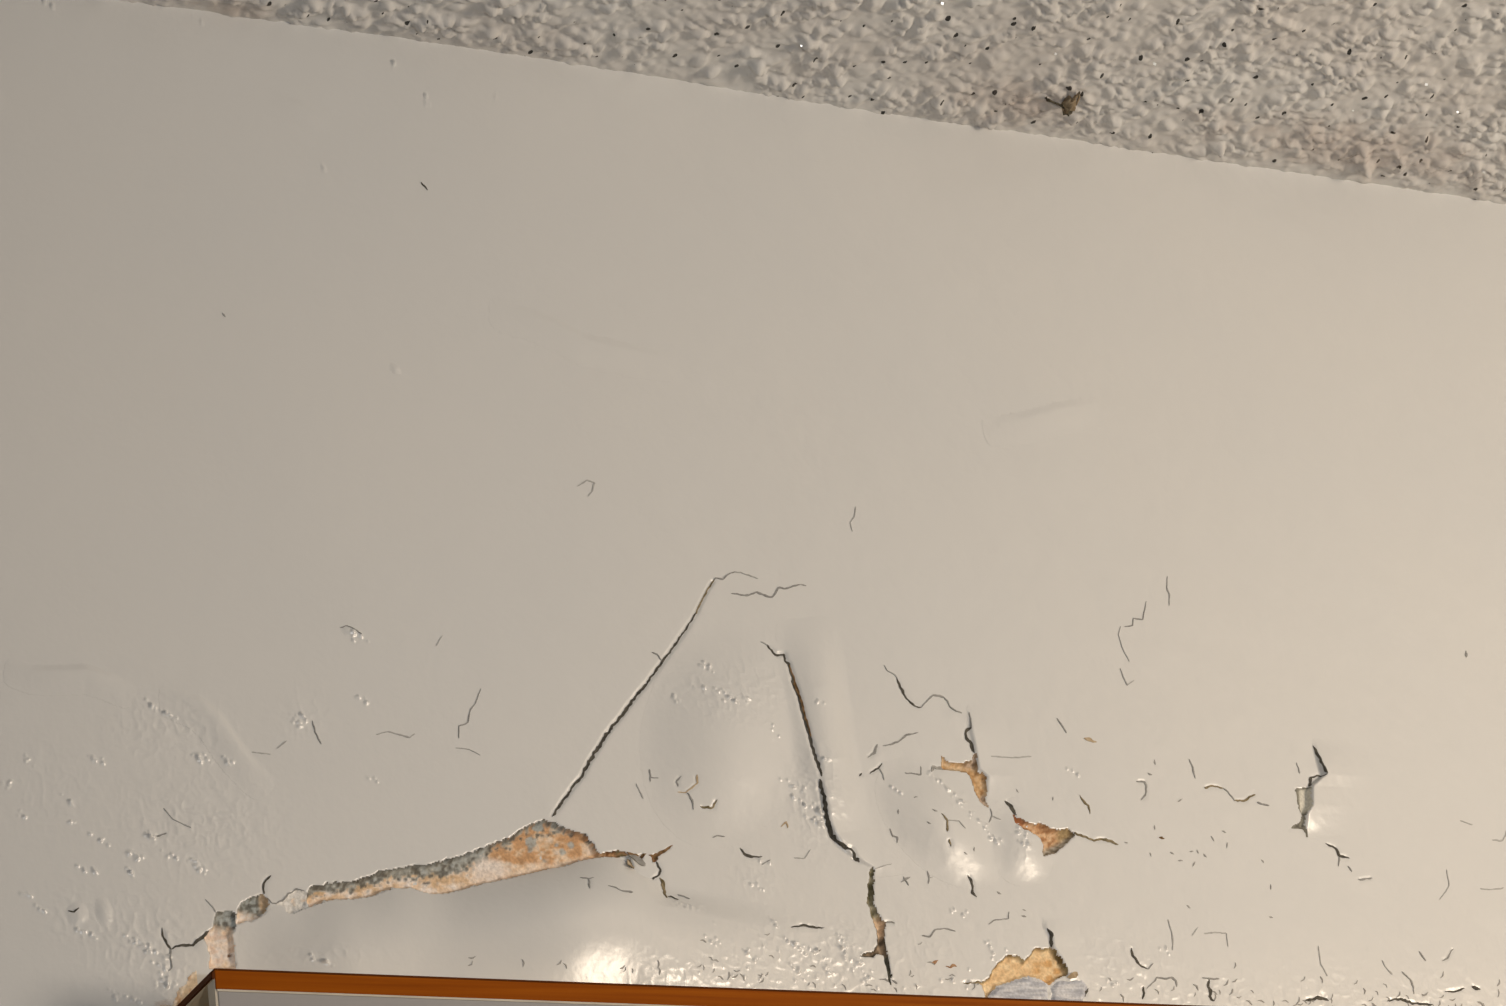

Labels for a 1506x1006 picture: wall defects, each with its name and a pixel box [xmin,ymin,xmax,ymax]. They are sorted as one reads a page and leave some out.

crack [552,571,806,817]
crack [1296,746,1328,786]
crack [636,641,1031,985]
flaking render [172,819,658,1006]
crack [580,845,690,900]
crack [1046,928,1054,947]
flaking render [972,909,1134,1002]